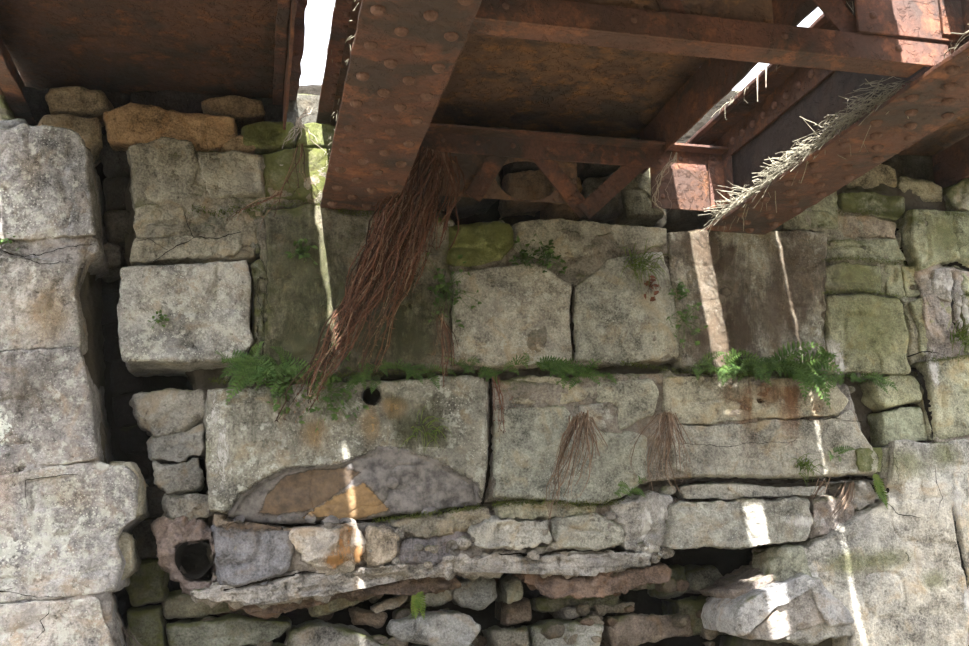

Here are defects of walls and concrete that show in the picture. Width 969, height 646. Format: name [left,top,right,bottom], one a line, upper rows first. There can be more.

leakage [259,218,445,376]
leakage [681,225,826,377]
crack [942,262,969,328]
crack [906,351,937,443]
crack [673,469,968,589]